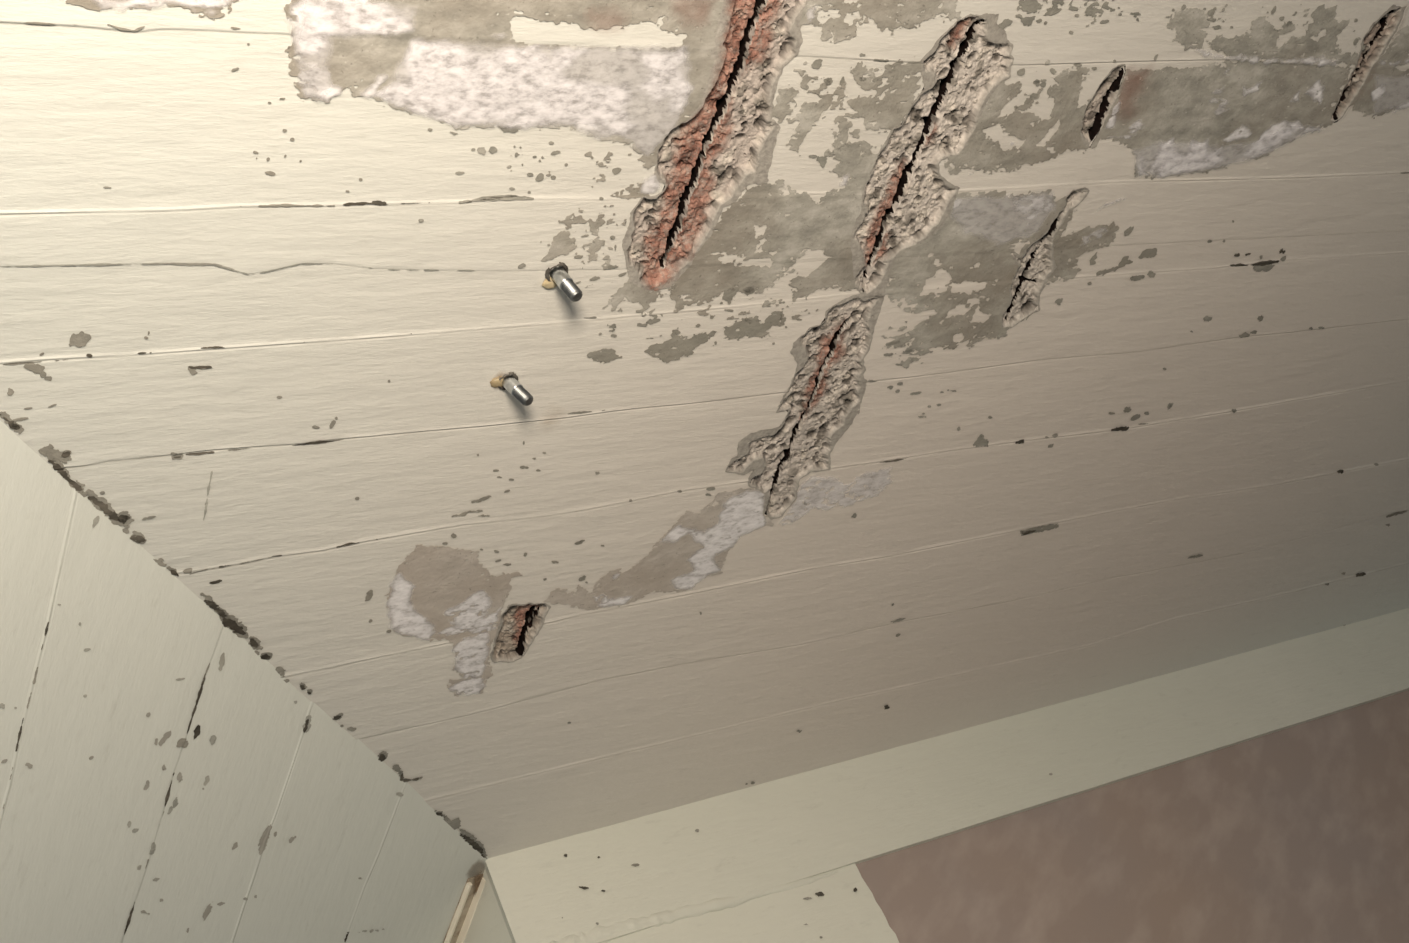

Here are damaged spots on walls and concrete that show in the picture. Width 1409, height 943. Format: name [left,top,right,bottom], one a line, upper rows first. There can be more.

peeling [66,0,250,45]
corrosion [645,0,779,291]
corrosion [865,168,902,263]
spalling [23,353,52,381]
spalling [69,331,91,348]
spalling [188,366,212,375]
corrosion [807,326,841,402]
peeling [268,0,1409,697]
spalling [154,731,171,746]
spalling [162,765,183,814]